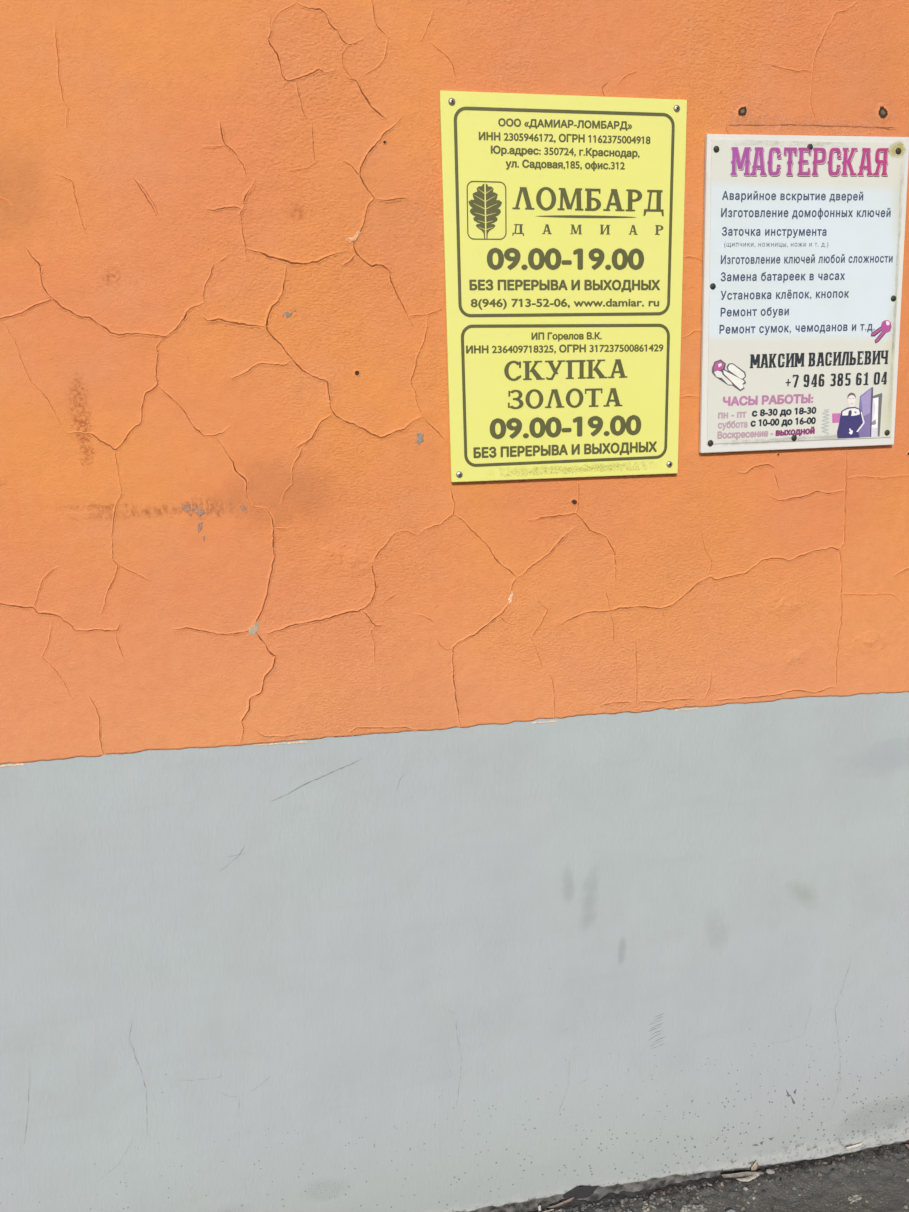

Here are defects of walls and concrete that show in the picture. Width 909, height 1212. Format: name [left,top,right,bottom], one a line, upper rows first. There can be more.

crack [0,0,909,755]